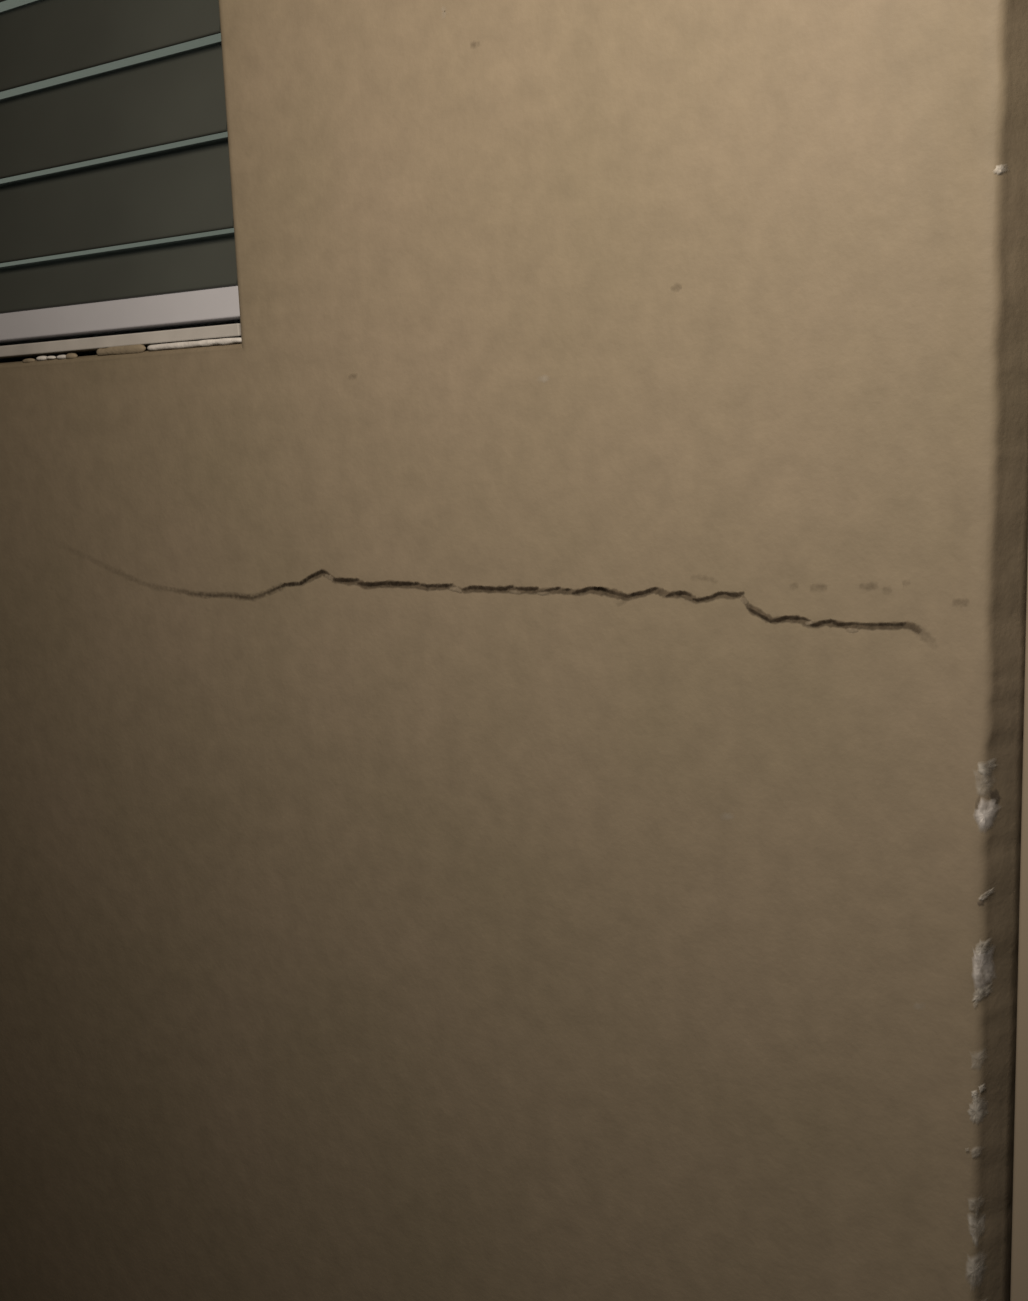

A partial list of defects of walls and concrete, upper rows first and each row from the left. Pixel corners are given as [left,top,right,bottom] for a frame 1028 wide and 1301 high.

crack [277,569,918,632]
peeling [975,791,1000,828]
peeling [973,940,992,1001]